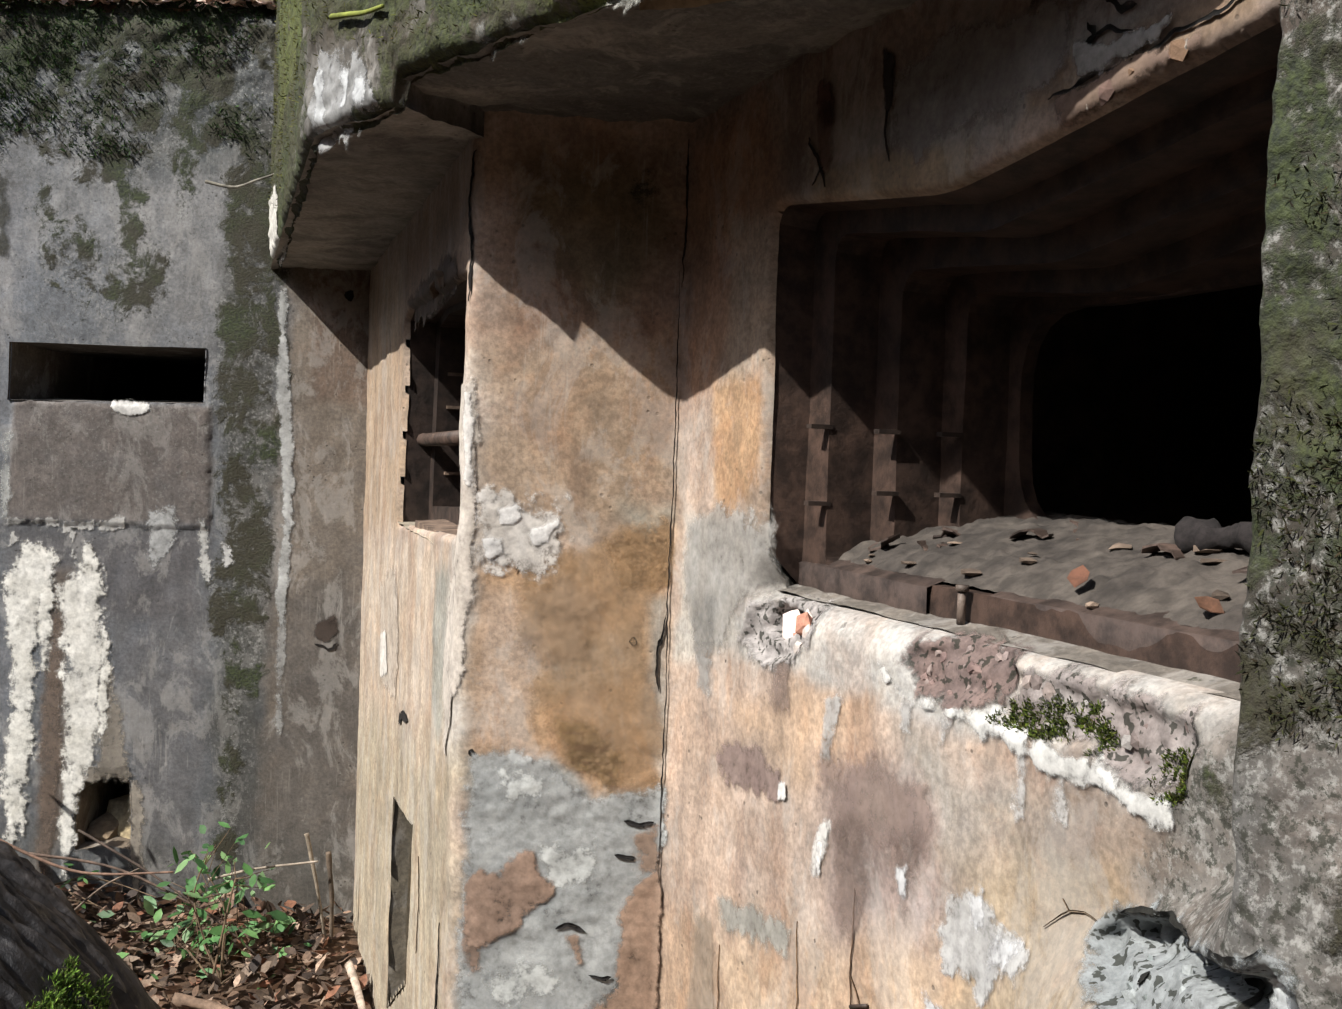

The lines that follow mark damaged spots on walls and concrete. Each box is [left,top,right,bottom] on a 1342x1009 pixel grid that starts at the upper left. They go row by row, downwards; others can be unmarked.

flaking render [883,0,1202,164]
crack [1048,0,1235,100]
water stain [0,177,9,255]
water stain [0,432,145,900]
flaking render [442,376,570,754]
corrosion [605,521,672,590]
spalling [736,595,836,671]
spalling [900,630,1200,793]
spalling [456,749,667,1009]
spalling [1078,897,1294,1009]